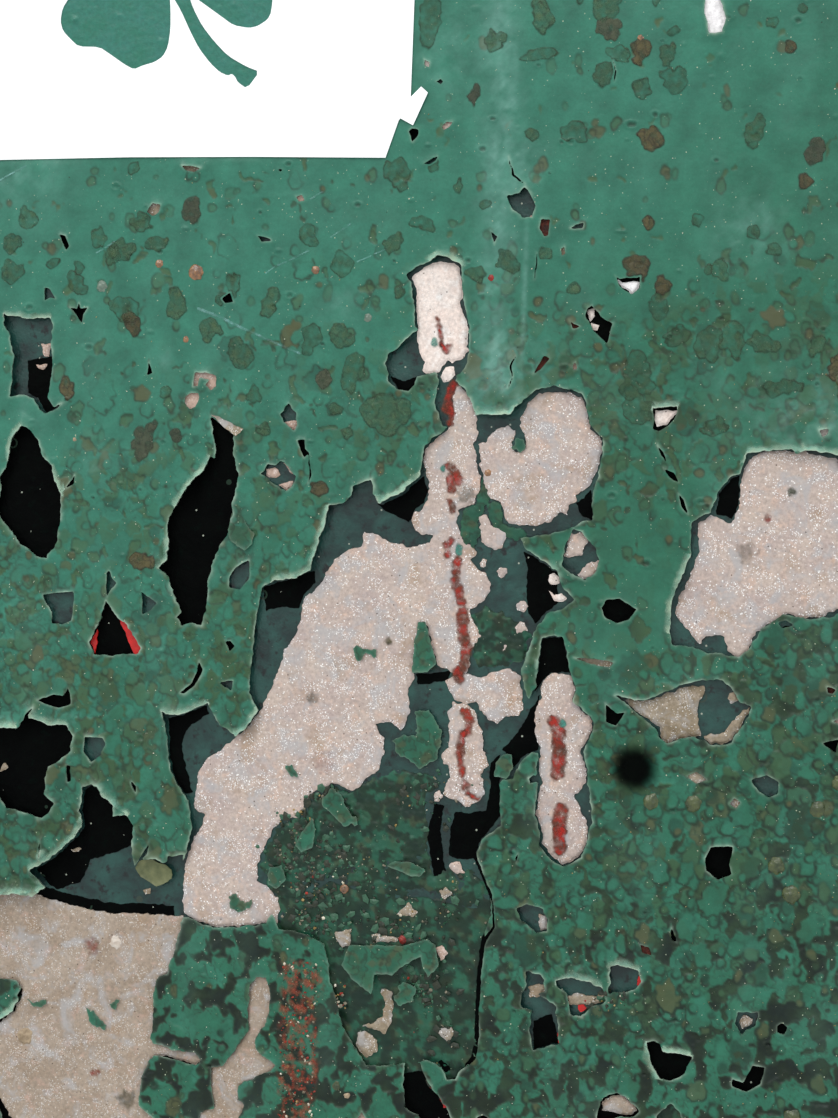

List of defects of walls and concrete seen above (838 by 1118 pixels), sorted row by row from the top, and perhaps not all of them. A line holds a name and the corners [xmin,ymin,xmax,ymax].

corrosion [436,317,451,354]
corrosion [441,380,458,426]
corrosion [444,463,462,513]
peeling [666,429,838,657]
corrosion [443,537,472,684]
peeling [0,252,613,1118]
peeling [617,679,751,745]
corrosion [456,708,480,800]
corrosion [547,715,567,780]
corrosion [552,803,568,856]
corrosion [277,962,320,1118]